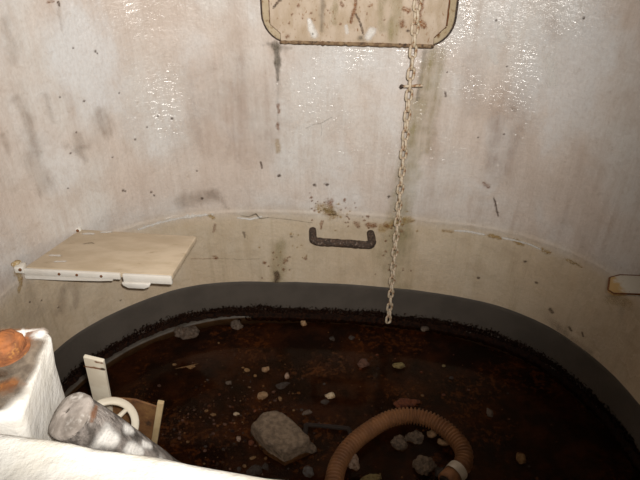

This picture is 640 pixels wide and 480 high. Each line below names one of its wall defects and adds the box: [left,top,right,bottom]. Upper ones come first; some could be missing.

rust [311,197,413,232]